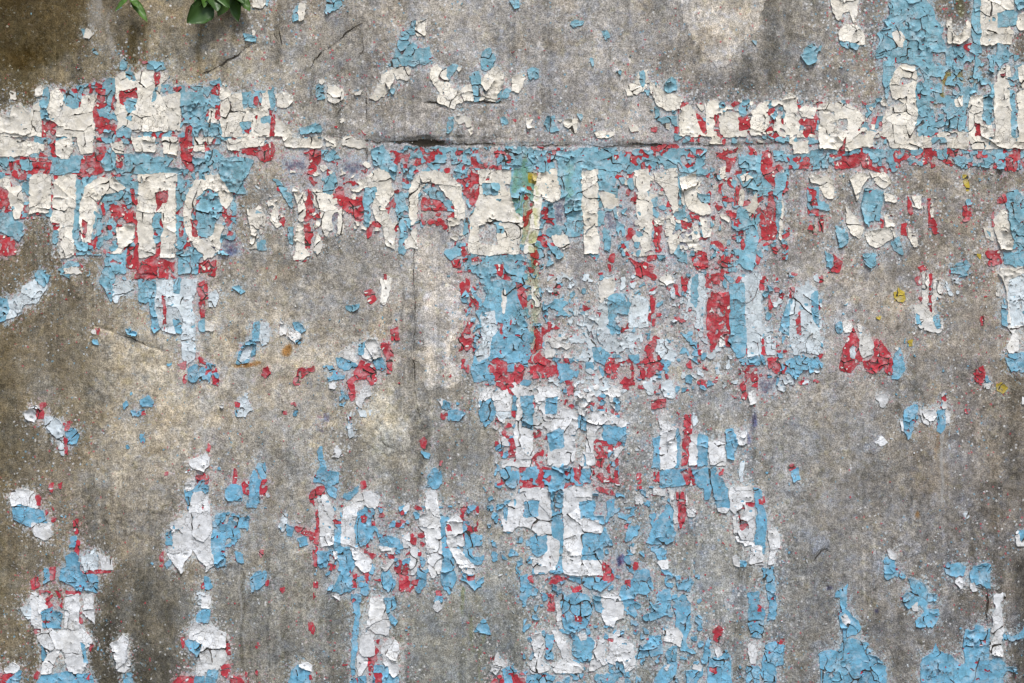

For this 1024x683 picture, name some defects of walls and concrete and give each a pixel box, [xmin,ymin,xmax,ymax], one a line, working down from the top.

peeling [315,19,549,136]
peeling [526,113,584,140]
peeling [907,189,940,234]
peeling [968,189,1024,381]
peeling [235,307,306,365]
spalling [289,319,433,459]
peeling [900,391,951,440]
peeling [967,365,1008,407]
peeling [0,470,142,683]
peeling [249,570,269,592]
peeling [818,527,1024,683]
peeling [288,650,335,683]